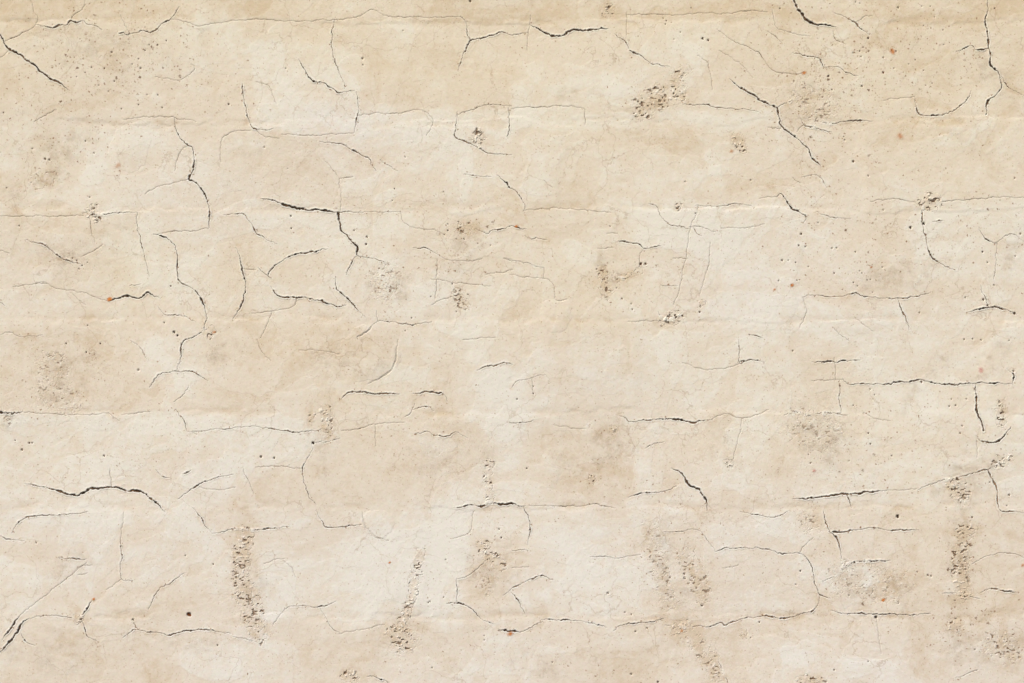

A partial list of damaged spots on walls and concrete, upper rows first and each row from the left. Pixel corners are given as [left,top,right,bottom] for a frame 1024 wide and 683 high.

crack [0,2,690,170]
crack [689,0,869,218]
crack [884,2,1022,116]
crack [0,104,611,541]
crack [625,322,1015,459]
crack [0,601,95,652]
crack [448,503,669,632]
crack [562,468,707,507]
crack [675,468,1016,642]